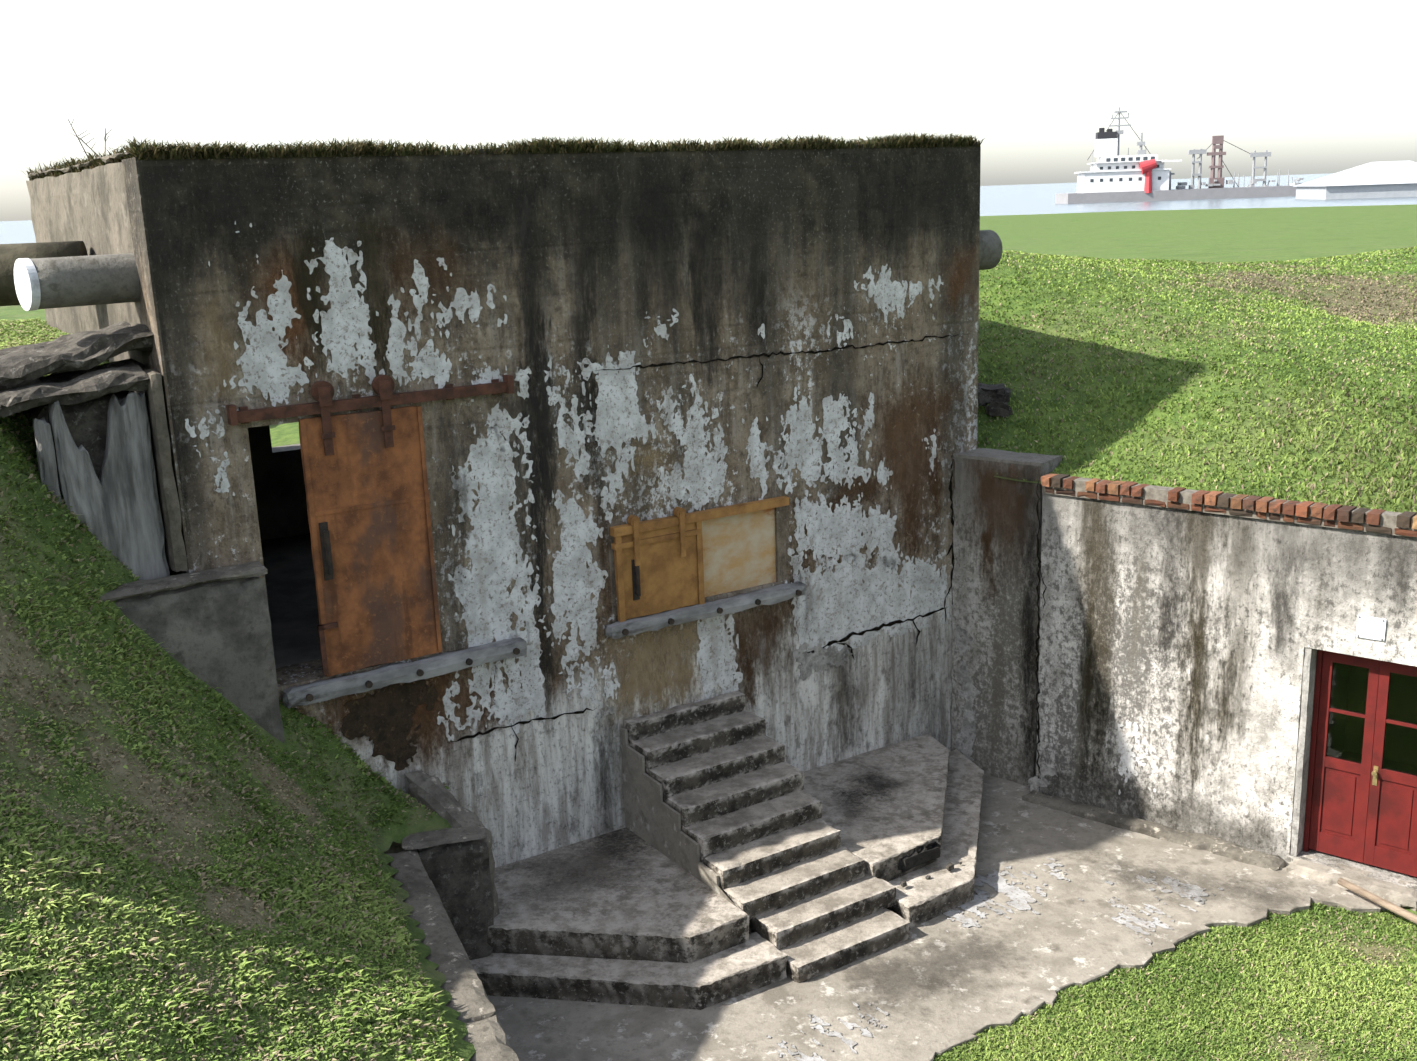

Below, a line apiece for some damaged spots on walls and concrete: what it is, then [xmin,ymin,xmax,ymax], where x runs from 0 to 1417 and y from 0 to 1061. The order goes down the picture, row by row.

peeling [826,307,859,351]
peeling [854,264,944,324]
peeling [223,238,728,771]
crack [445,708,595,761]
peeling [696,613,743,699]
peeling [742,386,981,762]
crack [807,451,954,660]
leakage [1189,511,1213,752]